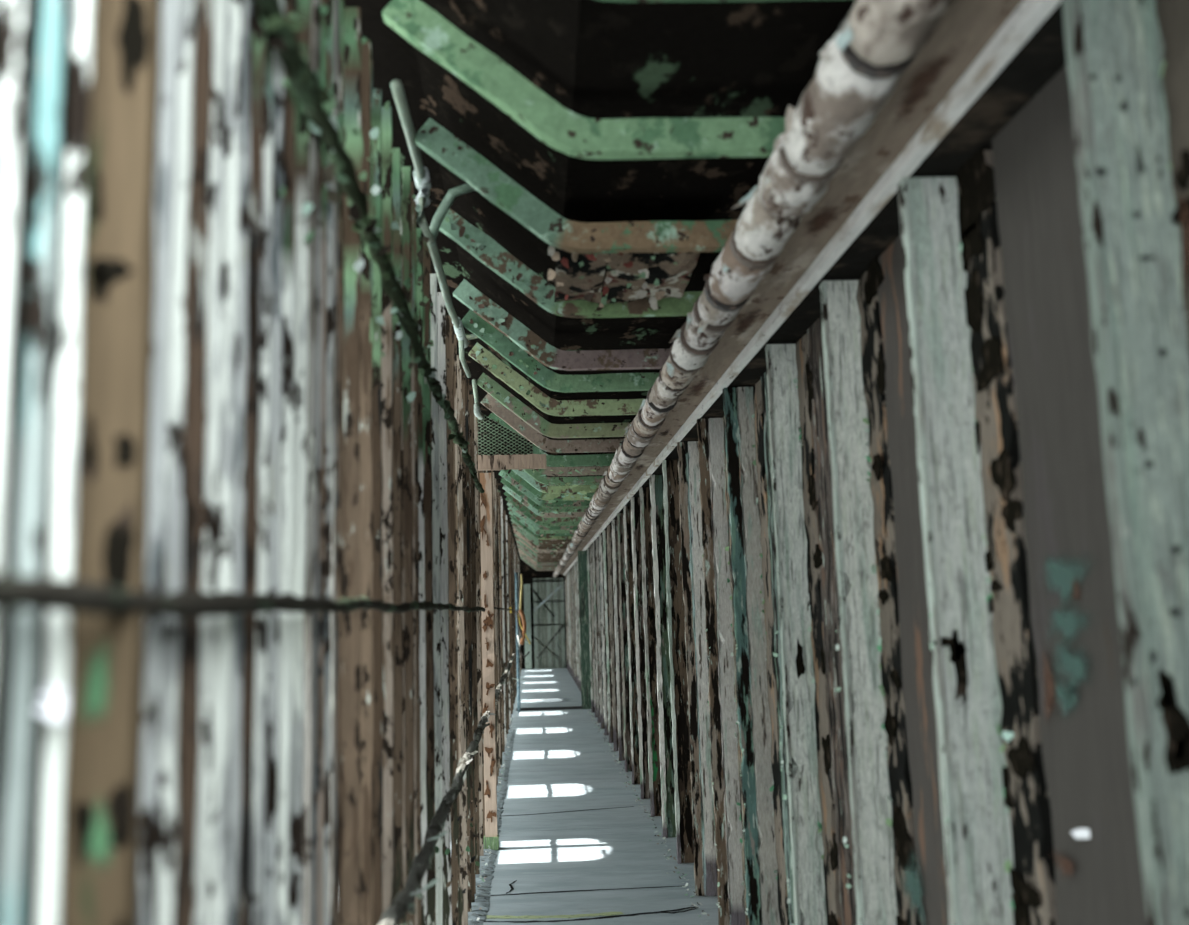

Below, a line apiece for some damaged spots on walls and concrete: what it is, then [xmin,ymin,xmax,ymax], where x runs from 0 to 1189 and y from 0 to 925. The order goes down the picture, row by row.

peeling [323,95,379,139]
peeling [359,158,381,200]
spalling [1171,150,1189,224]
peeling [506,246,700,310]
spalling [955,148,1004,392]
peeling [376,307,402,340]
peeling [407,392,430,414]
spalling [990,449,1023,533]
spalling [982,527,1003,613]
spalling [996,723,1035,813]
crack [478,876,698,923]
spalling [1004,860,1042,925]